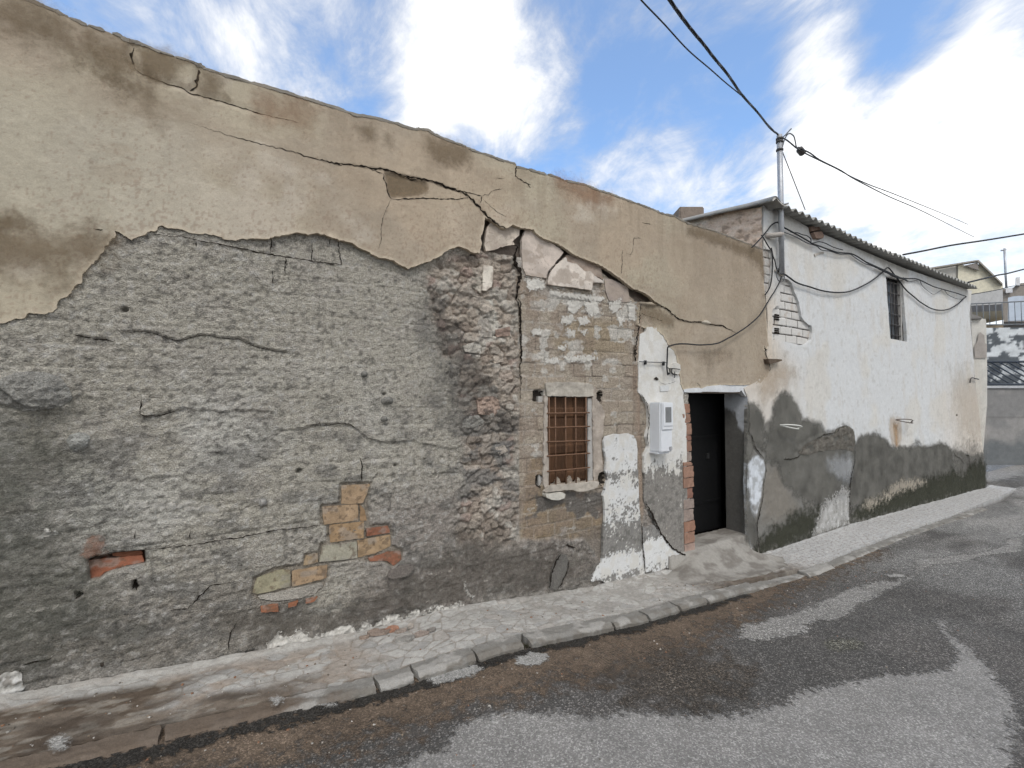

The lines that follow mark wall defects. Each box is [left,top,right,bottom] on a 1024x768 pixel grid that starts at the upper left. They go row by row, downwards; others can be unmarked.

crack [129,48,299,123]
crack [154,234,342,283]
crack [202,126,564,401]
flaking render [763,249,810,345]
flaking render [0,226,748,695]
damp [744,391,956,551]